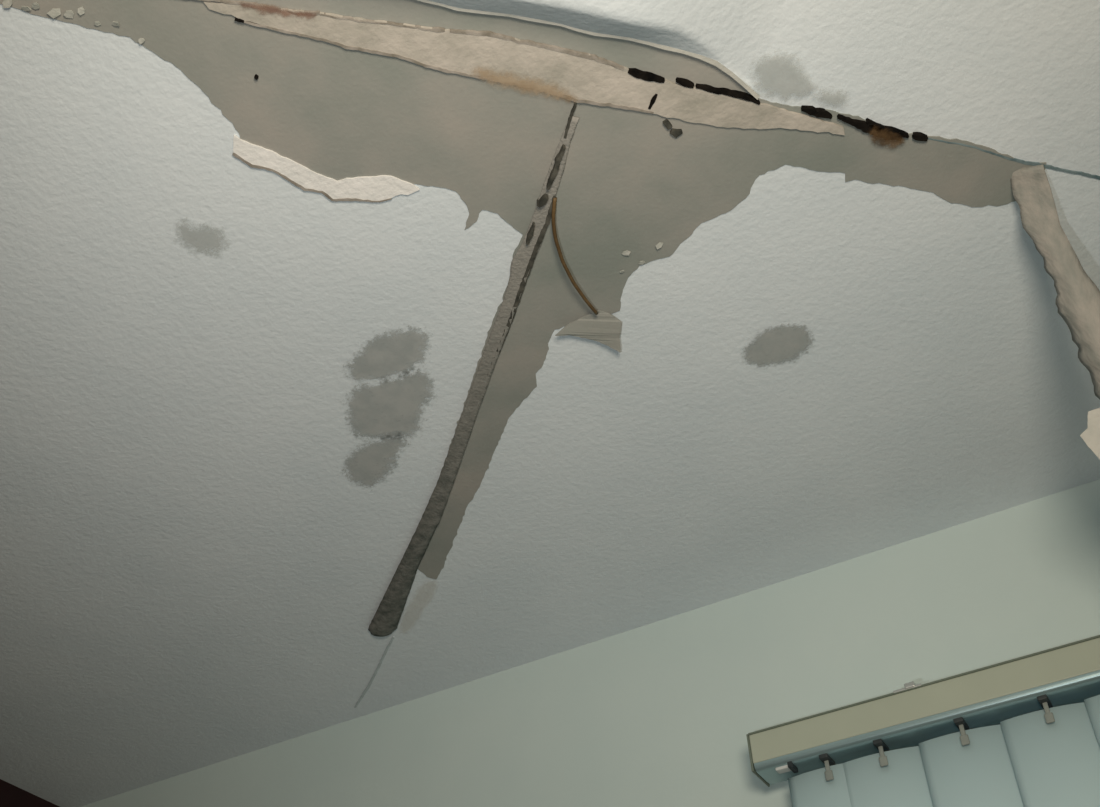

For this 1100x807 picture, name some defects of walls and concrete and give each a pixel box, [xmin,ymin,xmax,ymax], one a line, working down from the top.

corrosion [870,129,904,147]
crack [928,138,1100,180]
peeling [0,0,1046,579]
leakage [745,325,811,367]
leakage [344,327,433,487]